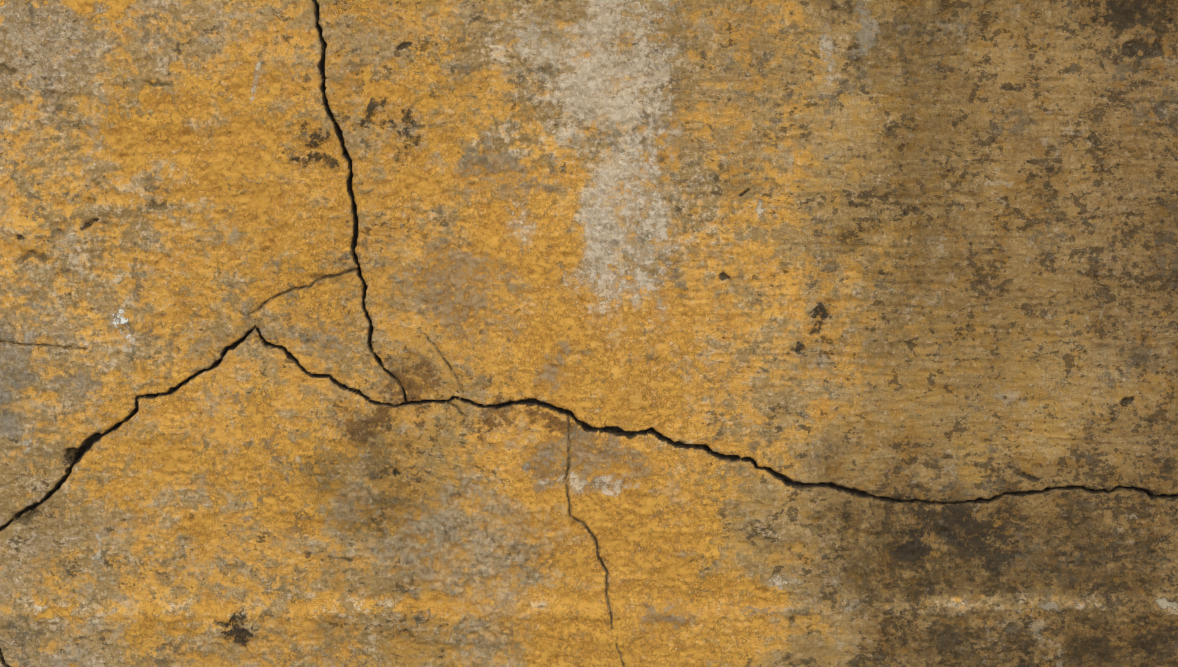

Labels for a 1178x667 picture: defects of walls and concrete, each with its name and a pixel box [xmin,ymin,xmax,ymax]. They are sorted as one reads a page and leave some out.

water stain [1091,0,1168,38]
crack [311,0,407,402]
crack [247,267,356,315]
water stain [794,302,832,354]
crack [0,326,1178,629]
water stain [890,497,1021,572]
crack [0,648,10,667]
crack [616,644,625,667]